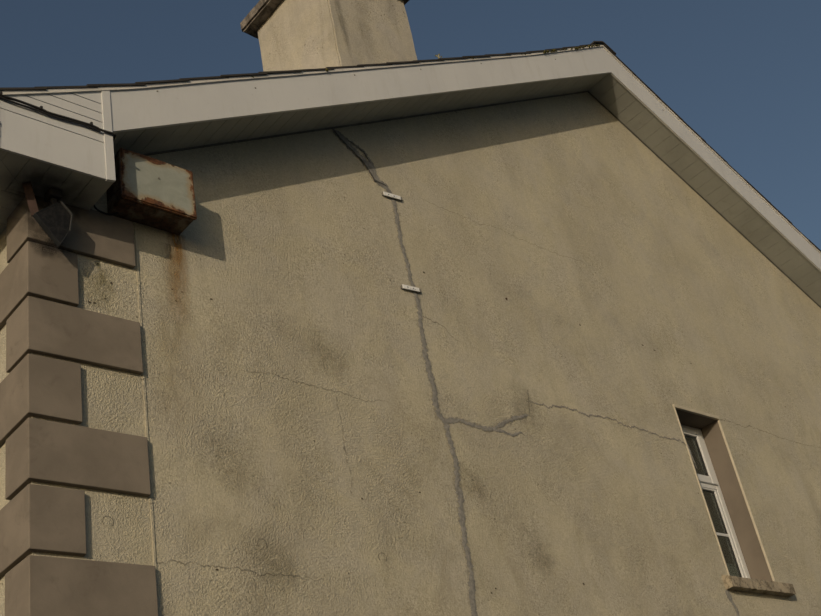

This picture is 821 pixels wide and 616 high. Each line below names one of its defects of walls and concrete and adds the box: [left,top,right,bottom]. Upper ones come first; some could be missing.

crack [332,129,697,616]